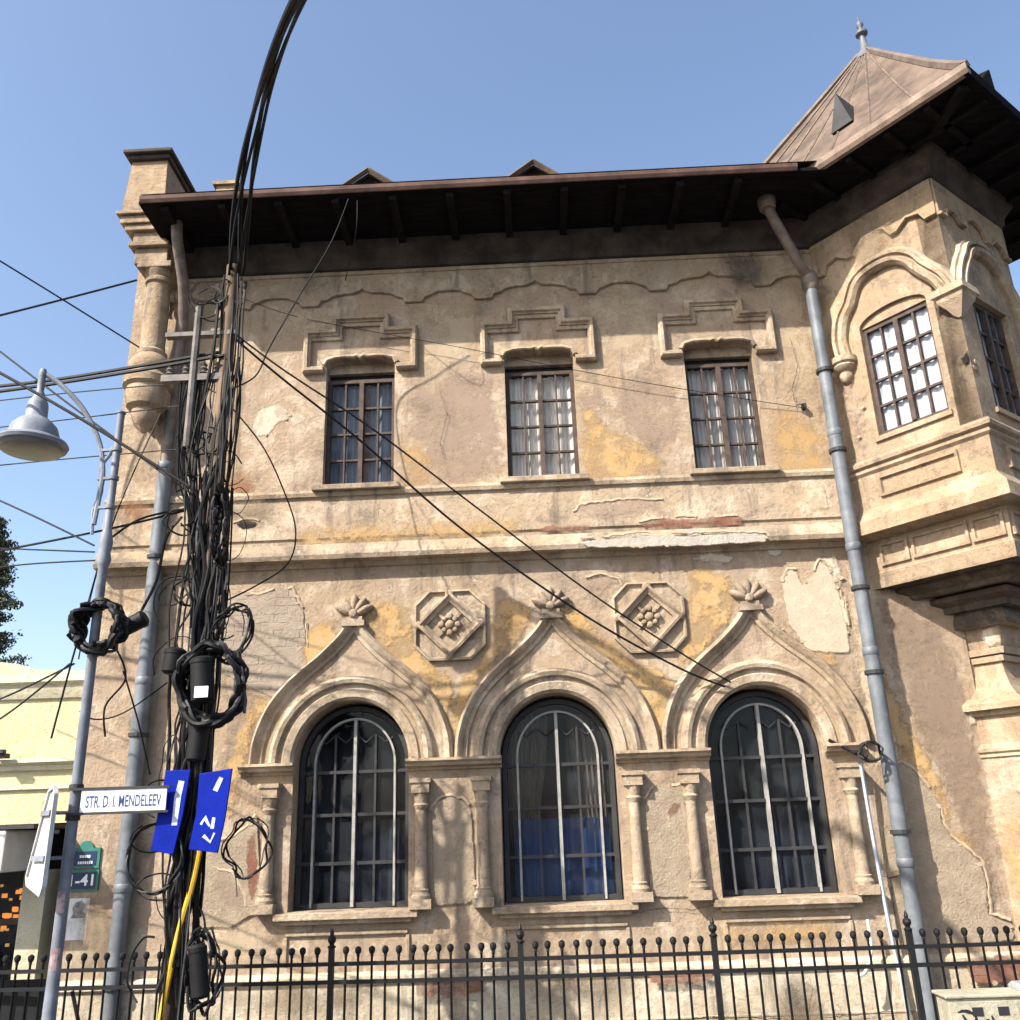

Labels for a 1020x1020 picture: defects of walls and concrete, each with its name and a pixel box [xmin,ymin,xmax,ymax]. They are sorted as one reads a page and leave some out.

flaking render [242,405,306,436]
flaking render [539,497,782,666]
flaking render [200,813,260,928]
flaking render [215,586,338,818]
peeling [364,598,531,737]
peeling [560,607,675,739]
flaking render [643,782,691,897]
peeling [731,924,828,942]
water stain [783,983,828,1020]
flaking render [780,554,907,945]
flaking render [883,678,1016,944]
flaking render [968,954,1020,986]